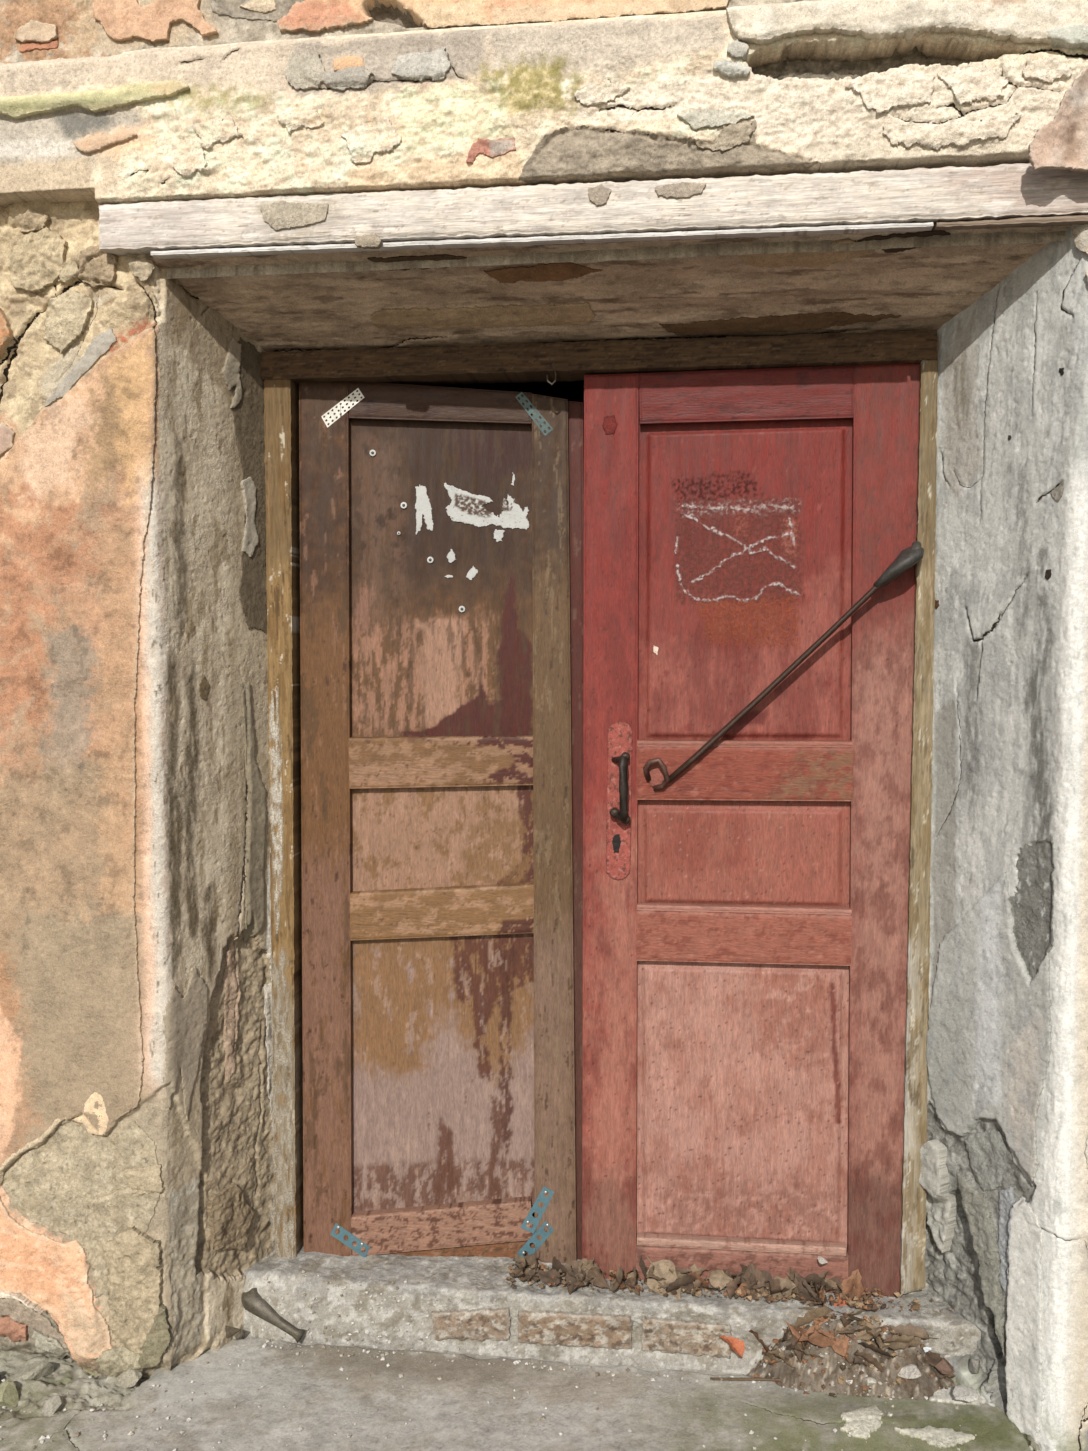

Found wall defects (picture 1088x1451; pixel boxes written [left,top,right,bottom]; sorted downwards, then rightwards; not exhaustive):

peeling [14,20,59,52]
peeling [92,0,729,43]
peeling [752,46,1088,172]
peeling [855,230,951,253]
peeling [1072,224,1088,281]
peeling [0,308,14,360]
crack [0,279,207,403]
crack [936,576,1028,837]
peeling [0,328,164,1370]
water stain [166,661,215,979]
peeling [917,835,1054,1445]